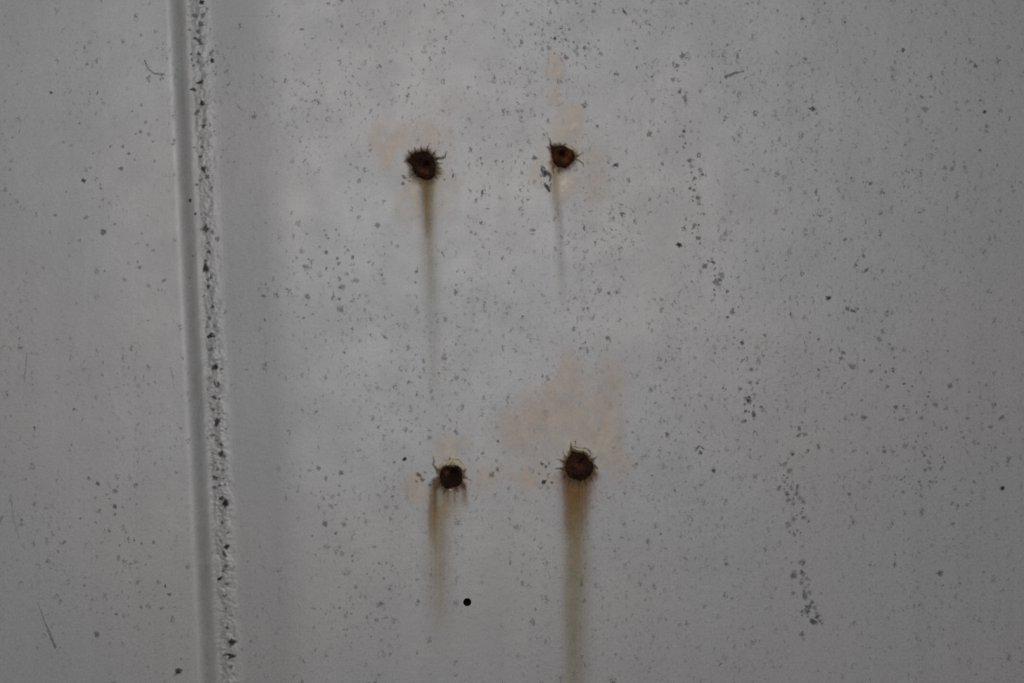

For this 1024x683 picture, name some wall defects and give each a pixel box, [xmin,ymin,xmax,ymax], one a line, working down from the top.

rust [406,148,444,210]
rust [550,141,582,174]
rust [432,458,466,526]
rust [557,446,595,562]